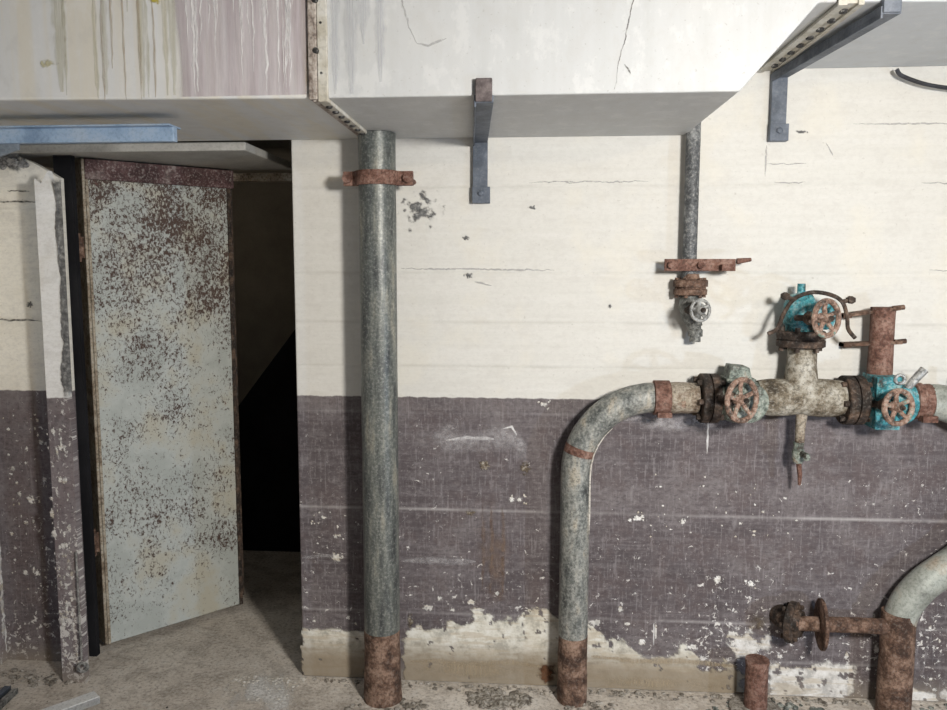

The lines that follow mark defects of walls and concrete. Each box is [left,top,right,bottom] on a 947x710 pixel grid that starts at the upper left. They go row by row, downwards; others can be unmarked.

spalling [402,191,436,231]
peeling [401,599,559,686]
peeling [587,619,856,698]